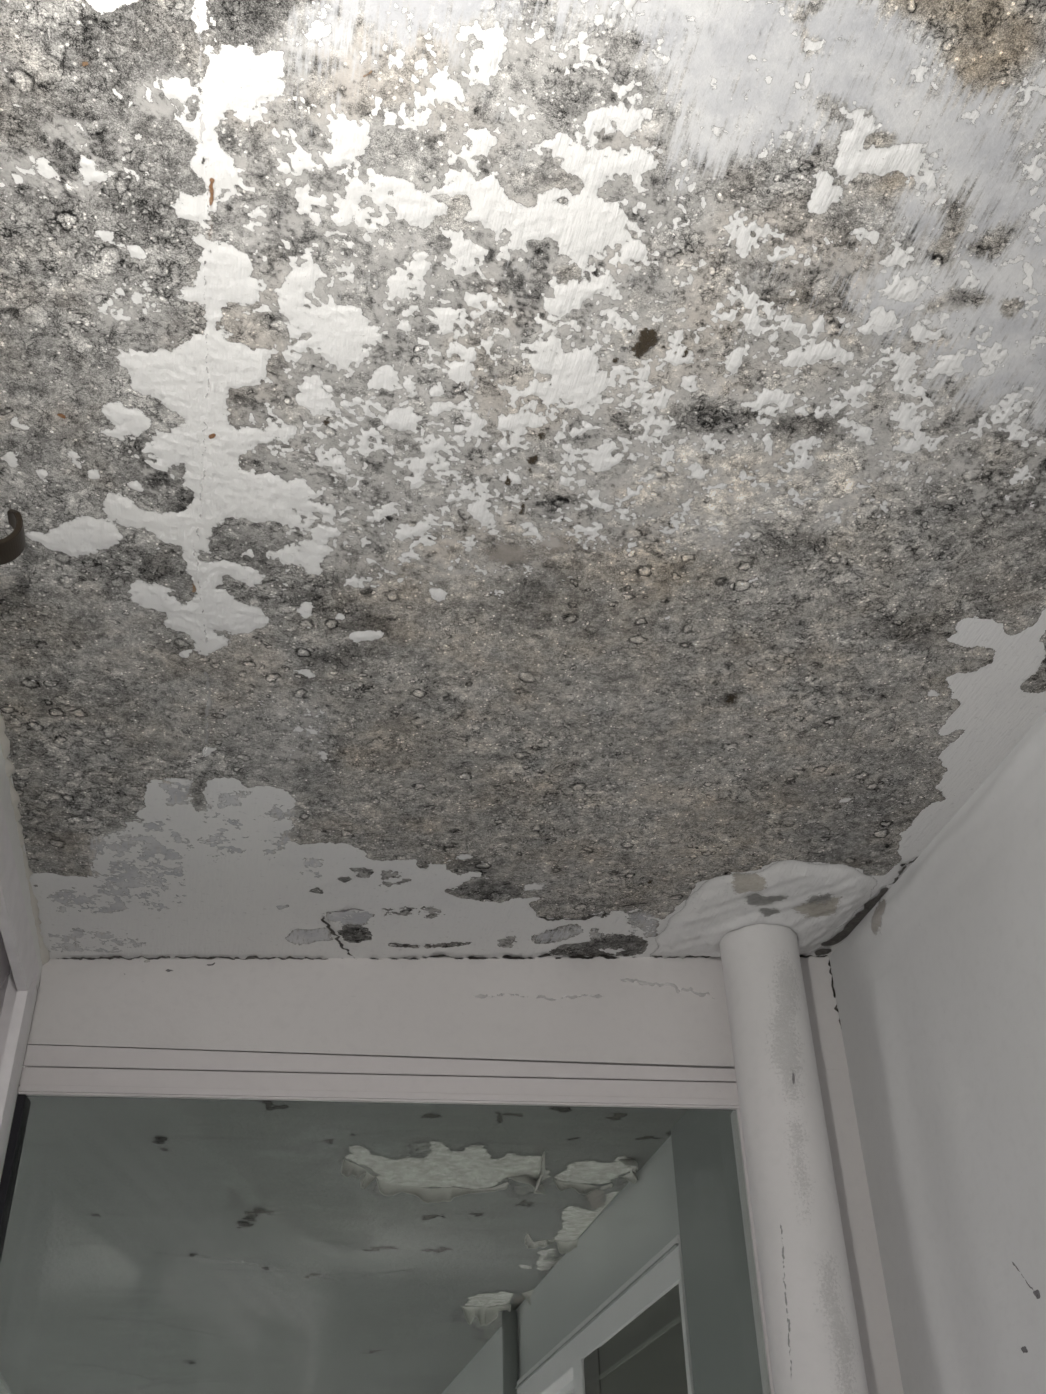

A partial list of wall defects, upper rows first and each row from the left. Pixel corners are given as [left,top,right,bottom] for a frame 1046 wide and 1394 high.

peeling [0,0,1046,957]
peeling [262,1101,289,1110]
peeling [324,1134,638,1273]
peeling [457,1289,534,1339]